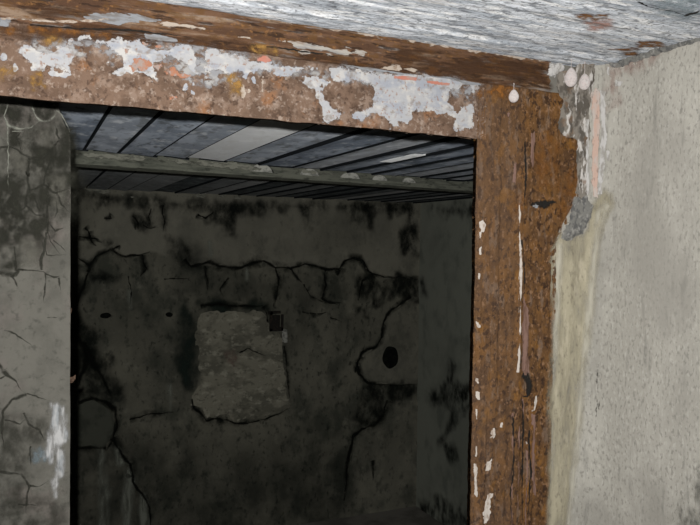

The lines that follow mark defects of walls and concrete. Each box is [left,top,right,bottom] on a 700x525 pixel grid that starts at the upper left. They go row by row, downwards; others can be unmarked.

rust [0,23,157,45]
rust [167,36,278,56]
peeling [19,34,481,132]
rust [293,49,550,98]
spalling [547,62,600,241]
leakage [387,202,417,255]
crack [164,255,414,322]
leakage [357,272,425,308]
leakage [548,90,611,525]
crack [70,226,168,525]
flaking render [190,310,291,423]
crack [0,365,46,506]